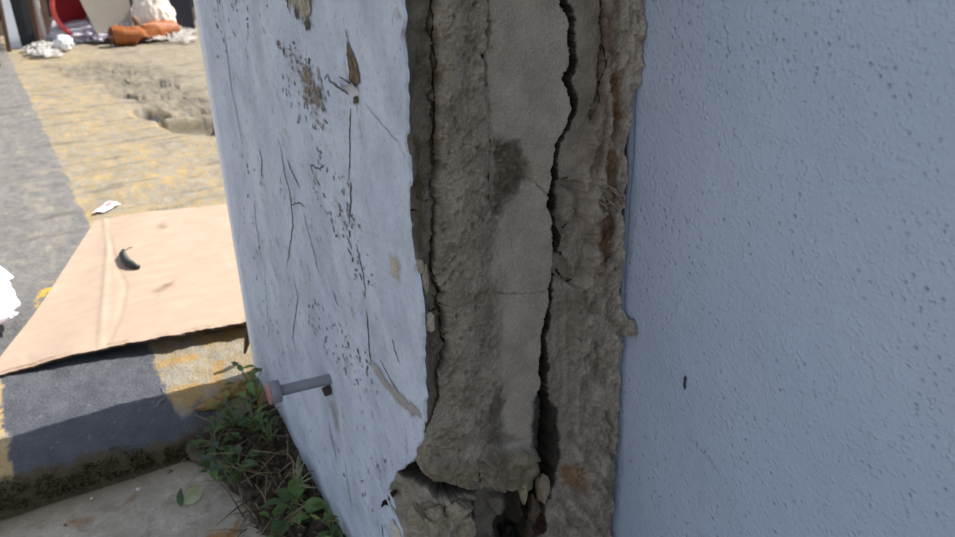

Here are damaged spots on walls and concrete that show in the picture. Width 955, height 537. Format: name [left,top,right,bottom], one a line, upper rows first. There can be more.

peeling [286,0,312,31]
flaking render [276,30,360,130]
crack [429,0,437,165]
corrosion [611,73,622,132]
crack [217,6,337,360]
crack [348,105,398,223]
crack [356,247,400,392]
spalling [389,0,647,537]
crack [492,0,607,433]
corrosion [601,213,615,264]
corrosion [607,152,617,199]
crack [381,489,397,534]